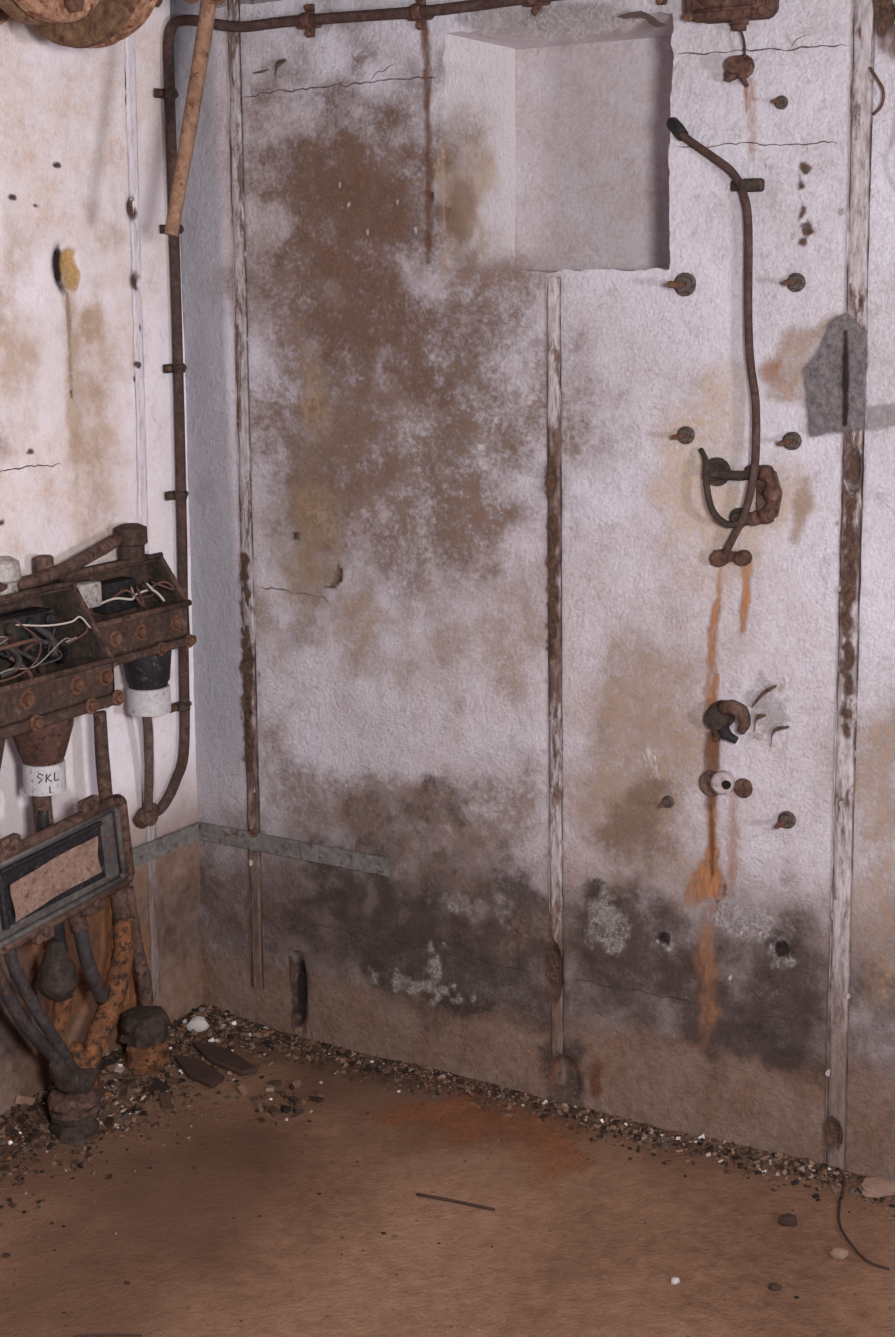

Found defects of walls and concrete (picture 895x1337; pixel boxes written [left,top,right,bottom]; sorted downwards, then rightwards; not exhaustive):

damp [252,82,588,627]
crack [0,463,61,472]
corrosion [706,575,721,710]
corrosion [741,563,752,632]
damp [281,763,550,1024]
damp [580,651,703,881]
damp [575,881,820,1073]
corrosion [685,796,734,904]
corrosion [705,733,719,772]
damp [853,724,895,994]